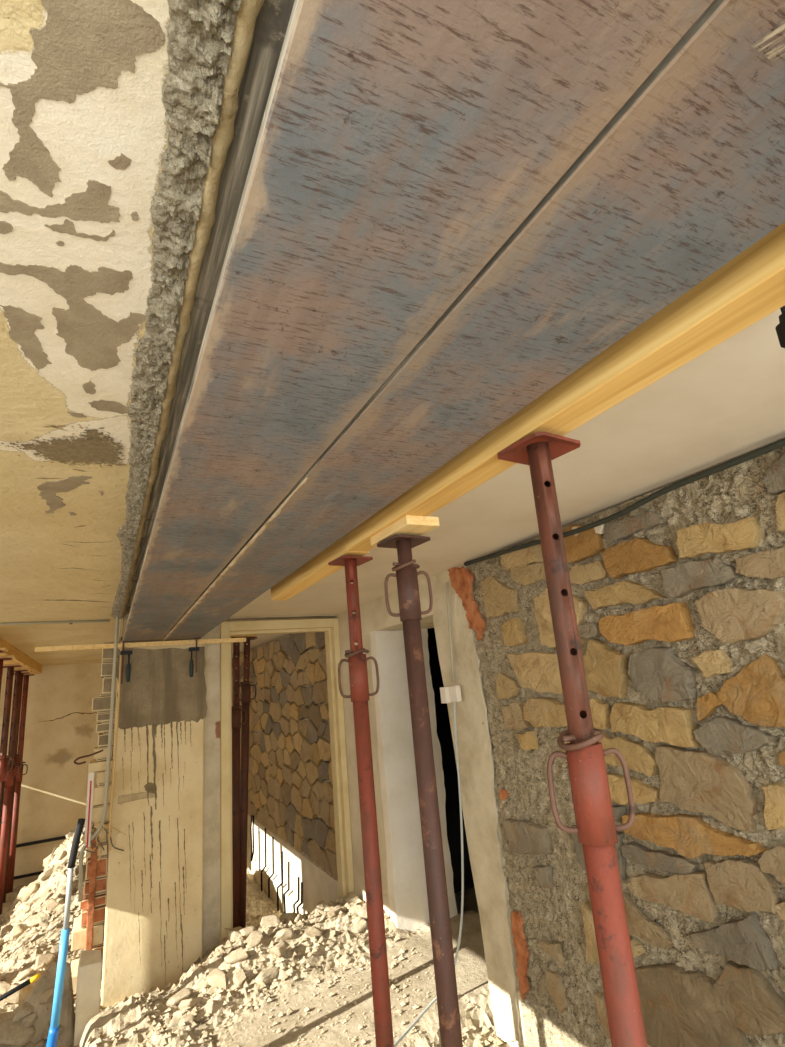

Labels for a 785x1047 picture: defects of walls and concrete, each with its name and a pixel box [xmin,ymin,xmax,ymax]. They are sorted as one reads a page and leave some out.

peeling [0,0,170,516]
crack [40,712,97,722]
water stain [122,721,191,982]